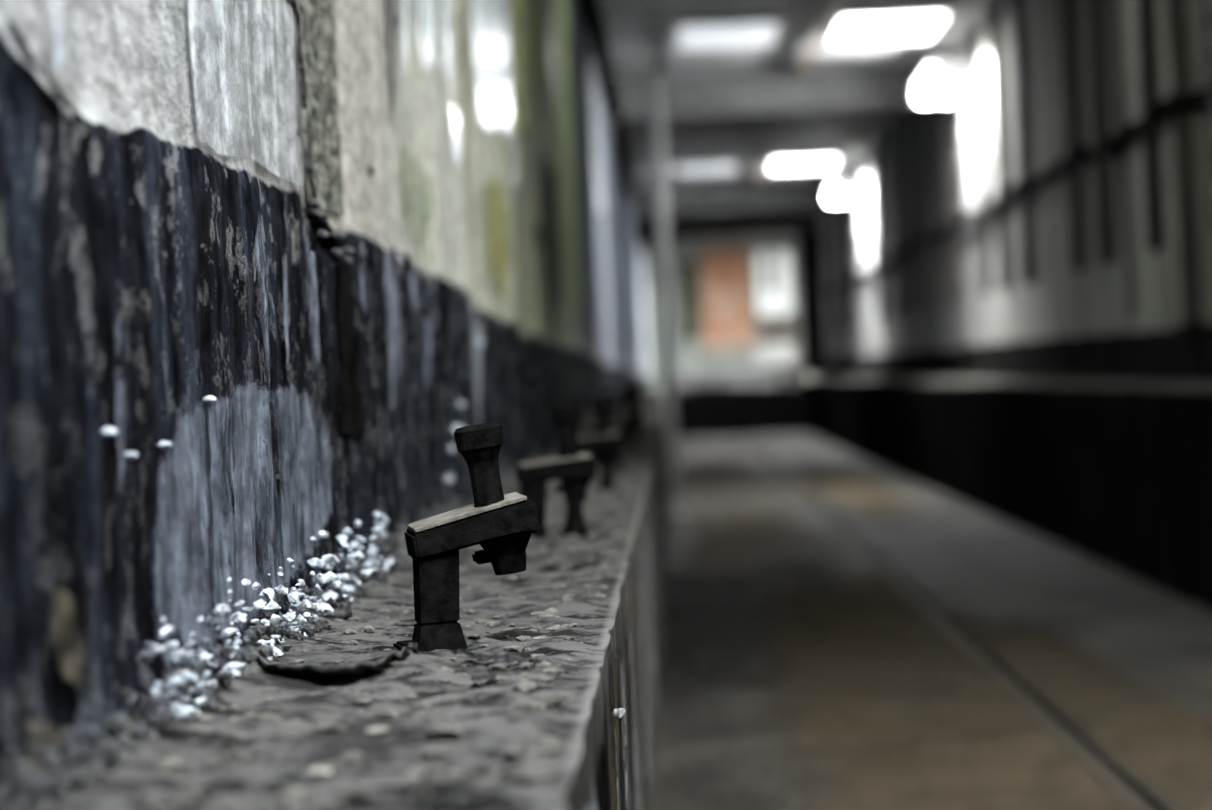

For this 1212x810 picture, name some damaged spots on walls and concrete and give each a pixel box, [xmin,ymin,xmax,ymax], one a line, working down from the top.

leakage [255,220,271,388]
leakage [305,234,320,372]
leakage [360,250,432,412]
leakage [116,378,127,481]
leakage [141,512,393,720]